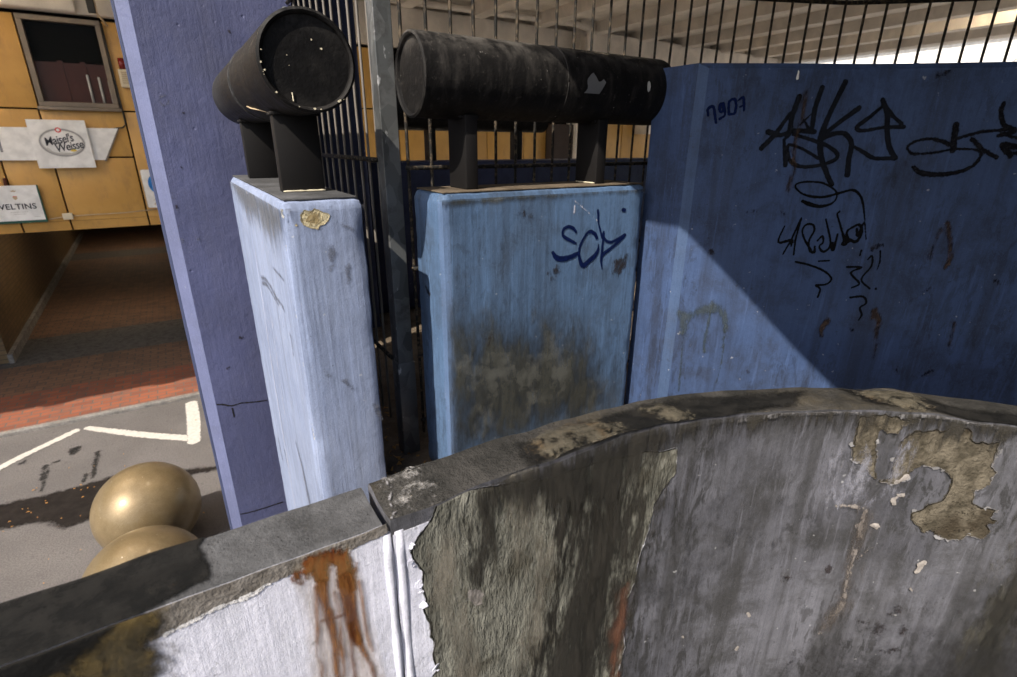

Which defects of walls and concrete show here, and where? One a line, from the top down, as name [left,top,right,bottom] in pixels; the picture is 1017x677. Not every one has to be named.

peeling [295,208,330,229]
crack [216,400,267,417]
peeling [763,412,1003,542]
corrosion [291,548,376,677]
leakage [467,501,497,589]
leakage [531,479,677,677]